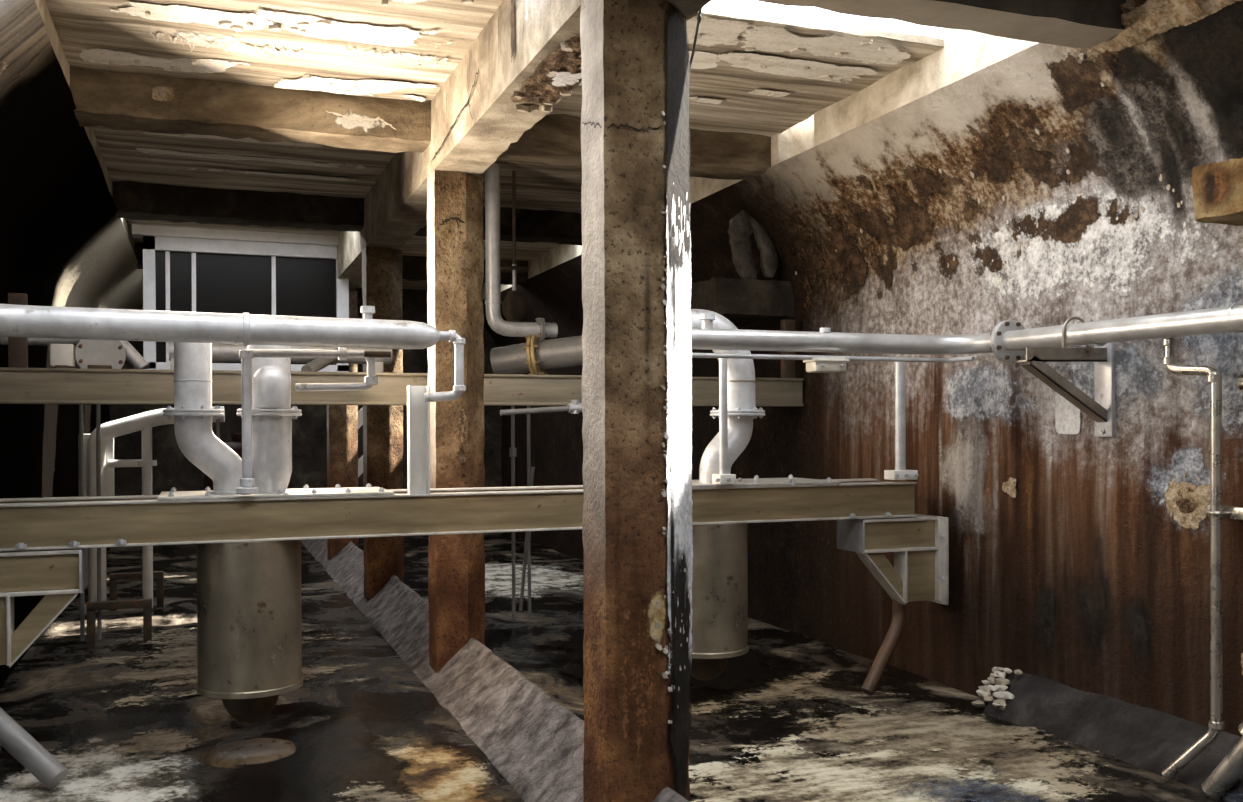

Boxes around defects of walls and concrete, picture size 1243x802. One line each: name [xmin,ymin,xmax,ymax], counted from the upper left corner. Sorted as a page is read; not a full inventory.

peeling [109,1,450,47]
spalling [1077,0,1241,60]
peeling [78,48,250,73]
peeling [273,74,436,102]
spalling [511,34,582,113]
crack [582,121,663,132]
peeling [689,96,723,104]
peeling [748,89,790,97]
leakage [1045,0,1243,215]
flaking render [942,364,1034,529]
spalling [1150,446,1210,530]
spalling [648,593,666,650]